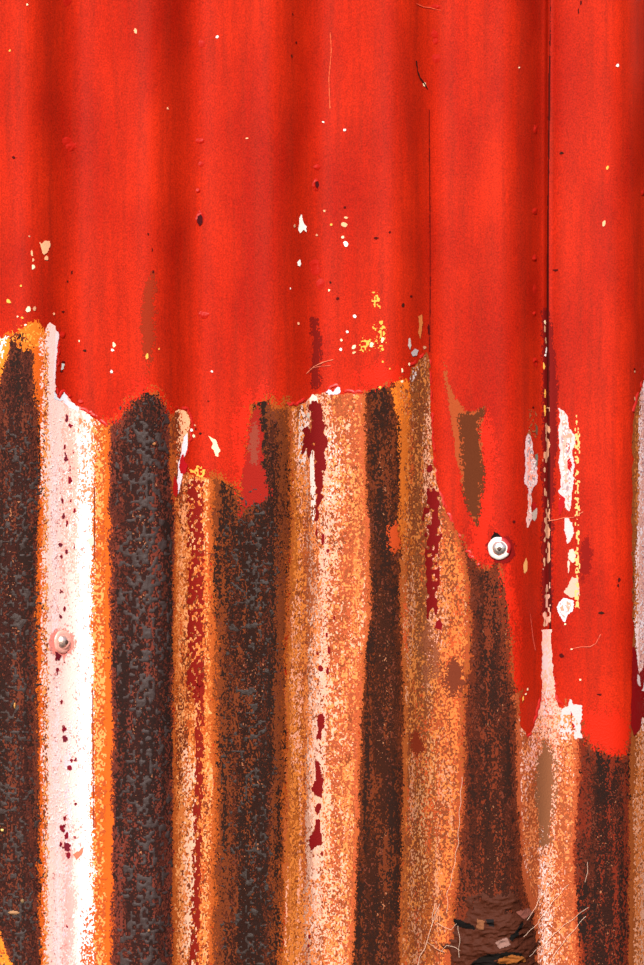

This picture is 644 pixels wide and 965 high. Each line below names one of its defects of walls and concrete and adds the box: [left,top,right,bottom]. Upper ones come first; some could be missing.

peeling [339,321,390,369]
peeling [175,409,220,463]
peeling [512,389,580,627]
peeling [558,699,583,742]